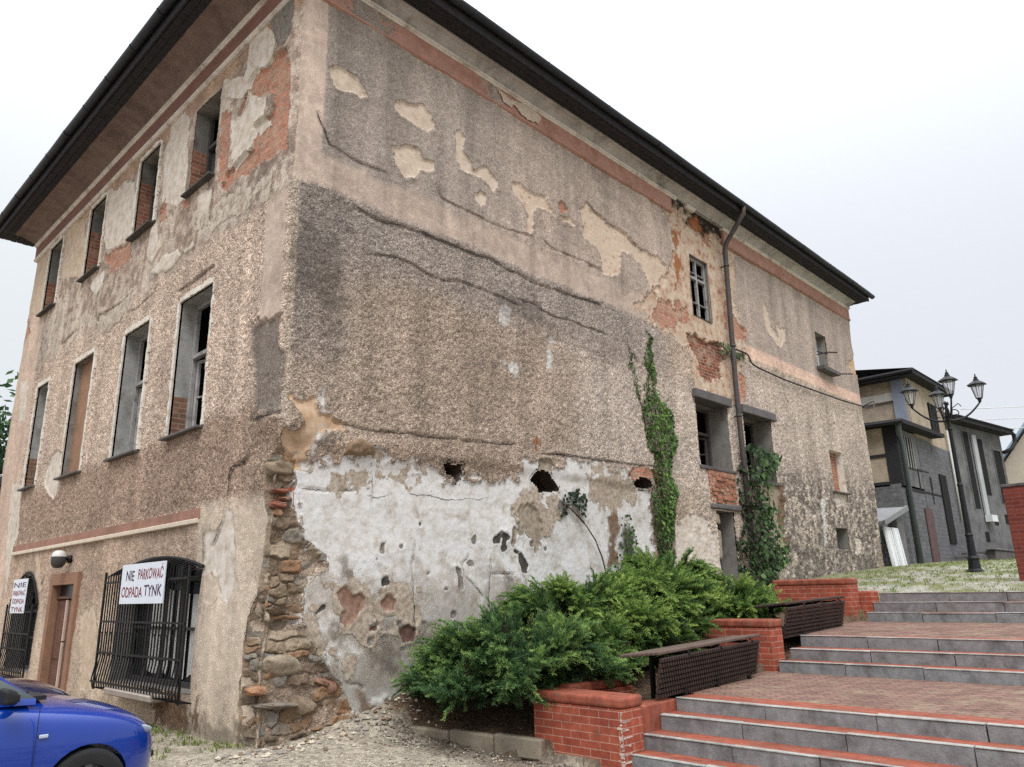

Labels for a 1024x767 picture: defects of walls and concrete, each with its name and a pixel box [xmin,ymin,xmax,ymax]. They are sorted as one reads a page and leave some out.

flaking render [218,49,291,191]
flaking render [329,65,368,98]
flaking render [394,100,435,132]
flaking render [391,145,435,178]
flaking render [454,130,498,207]
flaking render [91,241,132,296]
peeling [146,199,194,274]
crack [358,207,604,333]
flaking render [512,183,747,404]
flaking render [235,320,662,749]